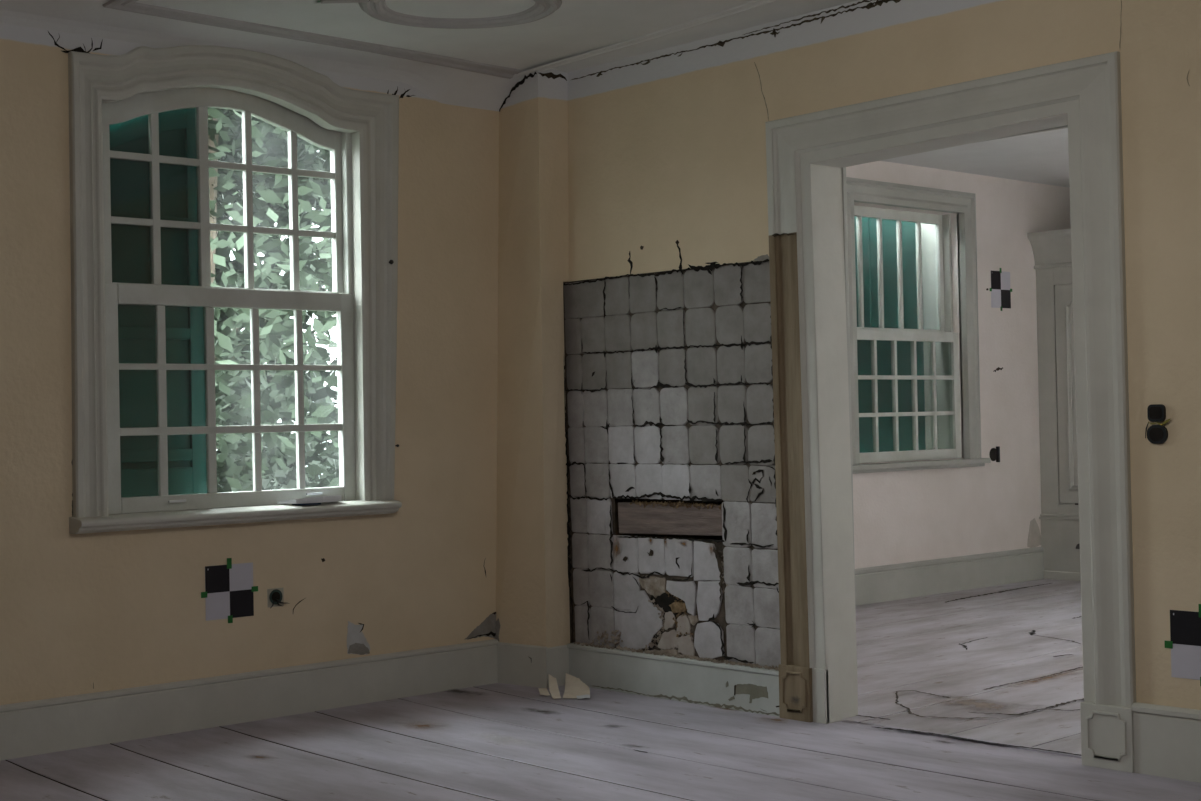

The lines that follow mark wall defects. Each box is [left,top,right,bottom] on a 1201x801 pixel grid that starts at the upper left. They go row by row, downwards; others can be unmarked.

crack [48,32,103,53]
crack [499,0,901,121]
crack [564,244,779,663]
crack [947,583,1051,602]
flaking render [347,621,370,655]
flaking render [464,612,500,642]
spalling [639,575,699,658]
peeling [726,681,779,712]
crack [857,616,1084,756]